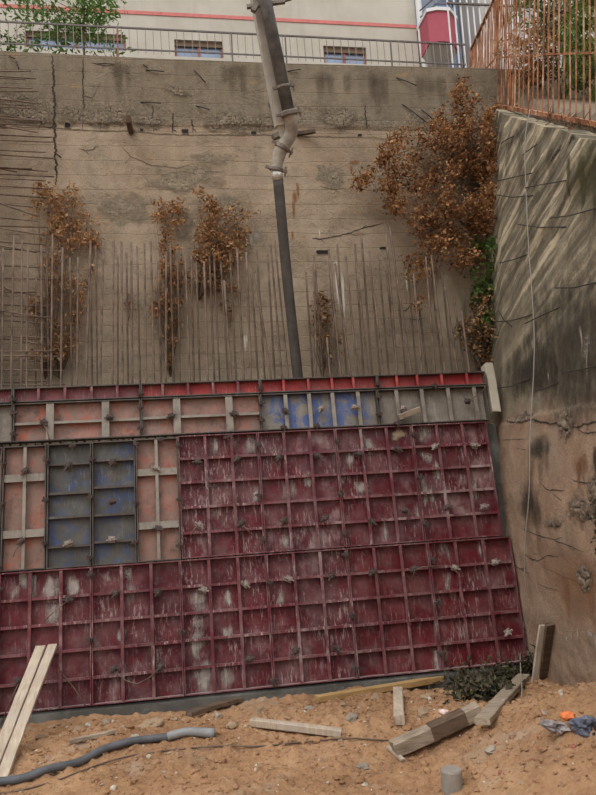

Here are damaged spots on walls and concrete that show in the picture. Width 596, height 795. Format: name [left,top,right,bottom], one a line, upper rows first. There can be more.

spalling [0,70,45,124]
crack [2,55,267,185]
crack [303,105,388,139]
spalling [0,125,56,159]
spalling [165,243,283,382]
damp [531,439,548,456]
crack [500,418,596,450]